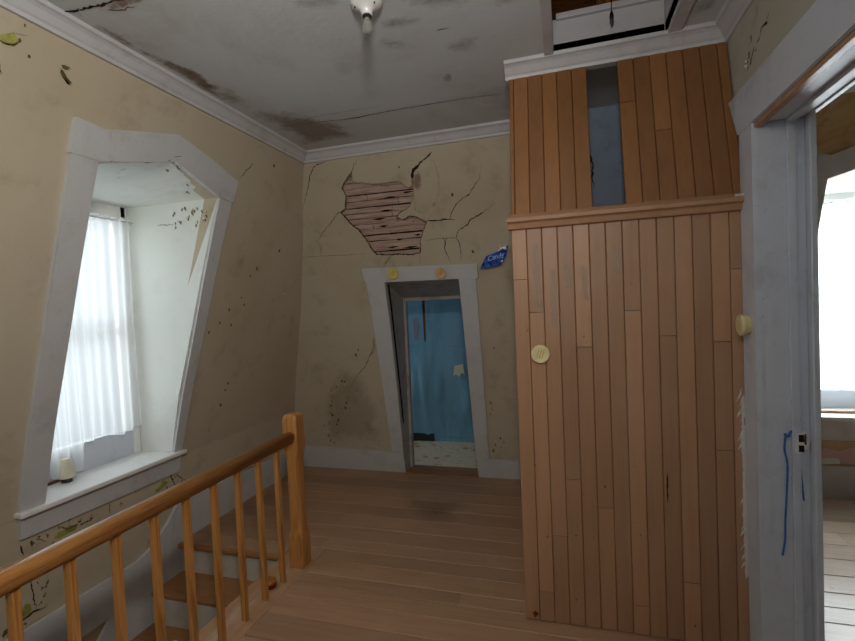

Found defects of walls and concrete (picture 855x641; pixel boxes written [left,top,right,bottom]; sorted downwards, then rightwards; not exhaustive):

crack [65,0,135,13]
peeling [0,24,27,46]
leakage [167,63,213,93]
crack [411,152,431,178]
crack [588,155,596,188]
flaking render [340,170,427,255]
crack [427,167,492,264]